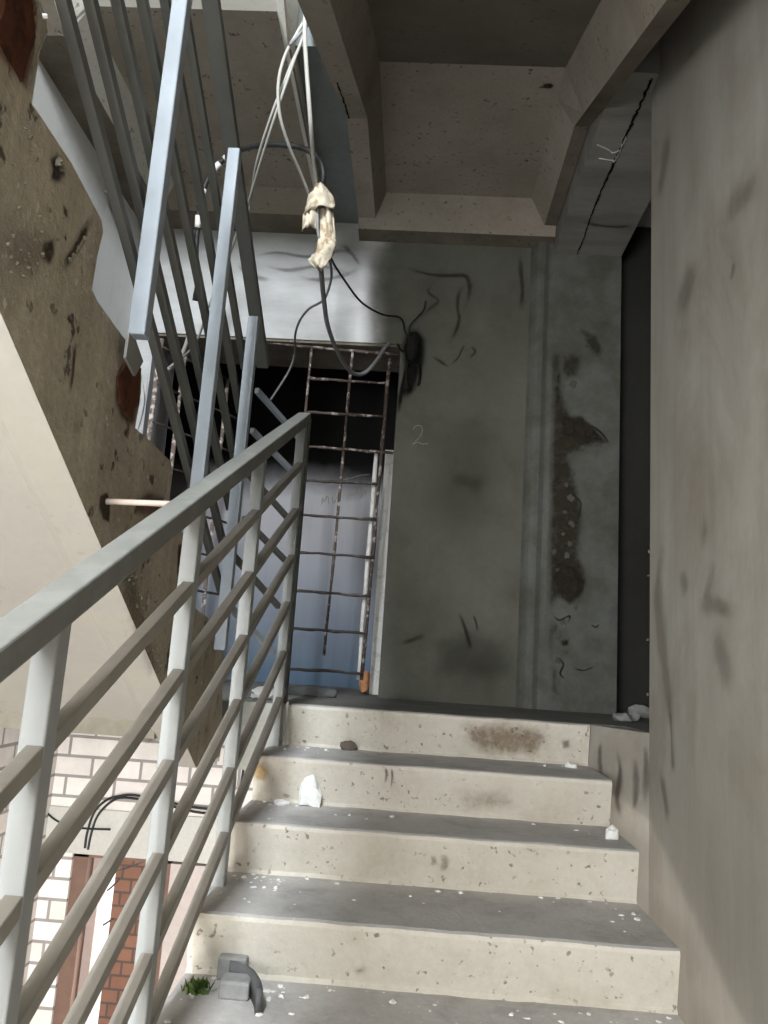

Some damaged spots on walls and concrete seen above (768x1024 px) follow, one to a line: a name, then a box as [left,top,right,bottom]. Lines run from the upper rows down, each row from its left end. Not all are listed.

crack [577,79,653,255]
rust [116,367,140,435]
peeling [550,357,607,677]